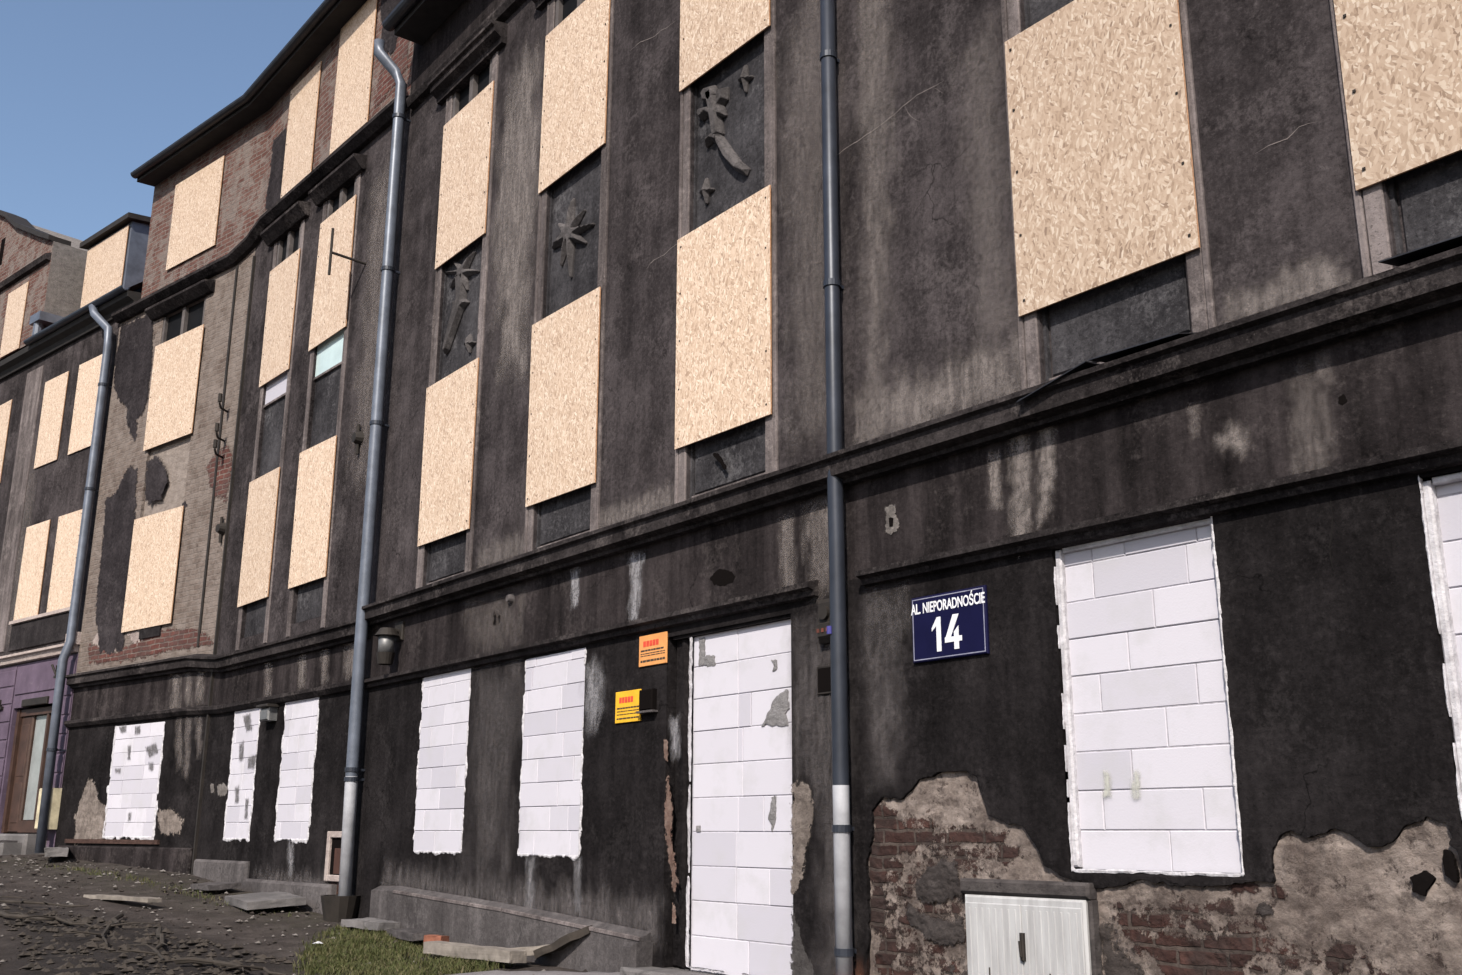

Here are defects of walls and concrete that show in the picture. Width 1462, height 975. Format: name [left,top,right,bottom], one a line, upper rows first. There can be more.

flaking render [88,455,213,665]
spalling [206,445,232,503]
leakage [989,427,1055,536]
spalling [74,779,106,846]
spalling [156,807,185,836]
flaking render [663,739,679,924]
flaking render [789,780,814,975]
spalling [868,771,1462,975]